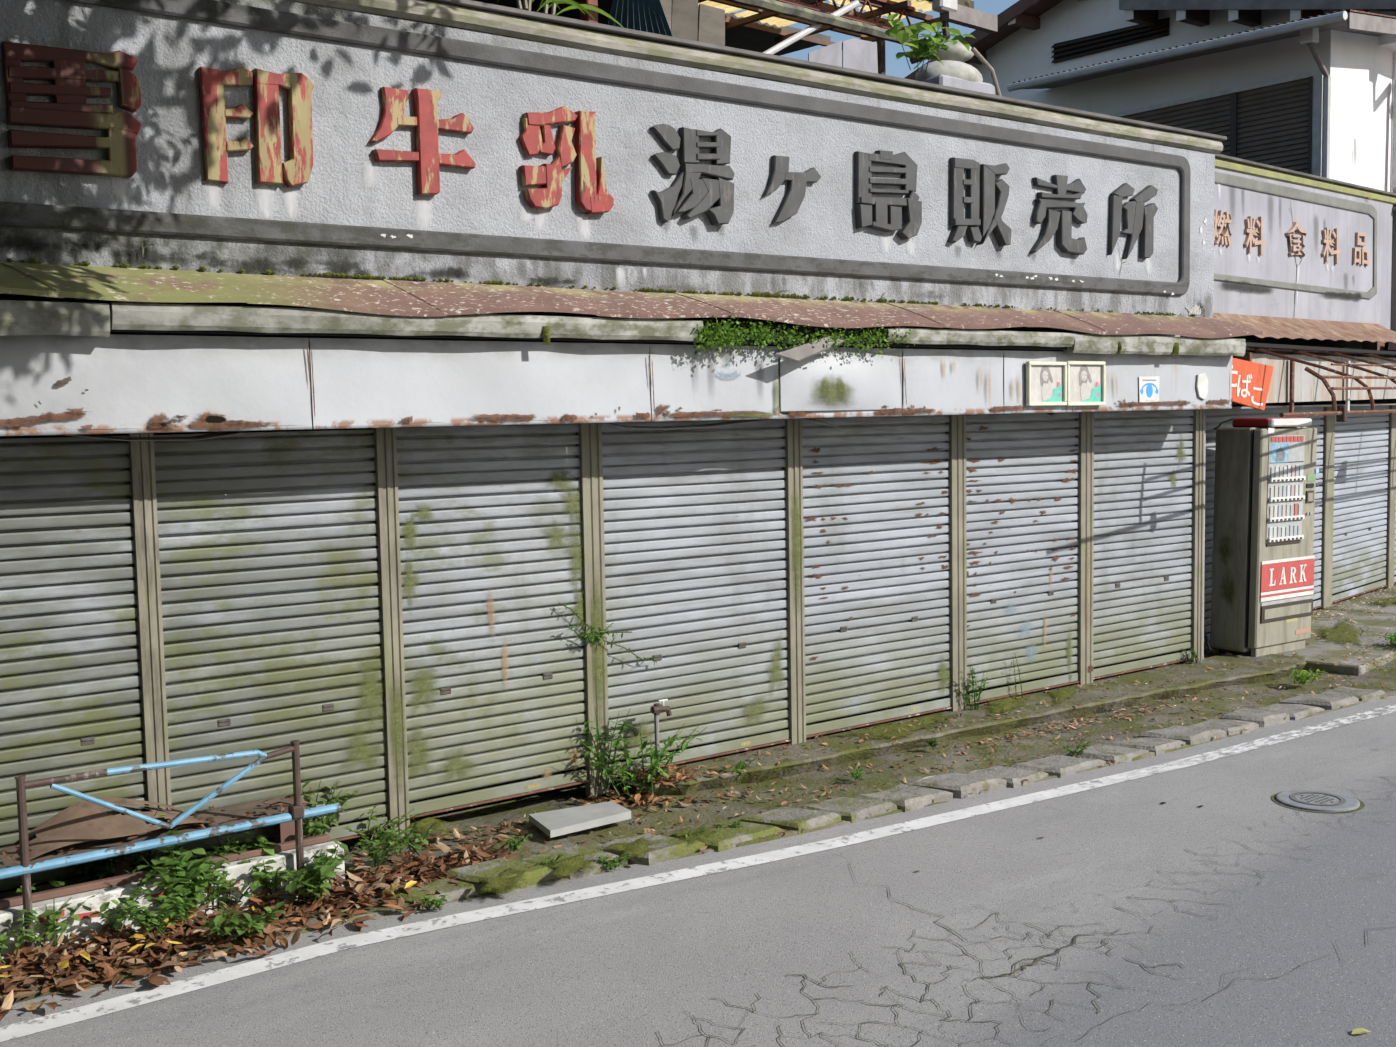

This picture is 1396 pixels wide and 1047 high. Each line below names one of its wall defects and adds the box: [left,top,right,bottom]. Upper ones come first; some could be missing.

water stain [259,186,296,217]
water stain [418,201,430,227]
water stain [83,242,308,273]
water stain [325,261,368,276]
water stain [406,268,465,281]
water stain [531,277,574,286]
corrosion [307,346,315,416]
corrosion [0,408,93,430]
corrosion [149,413,272,429]
corrosion [810,447,852,488]
corrosion [966,449,1078,597]
corrosion [1026,537,1089,590]